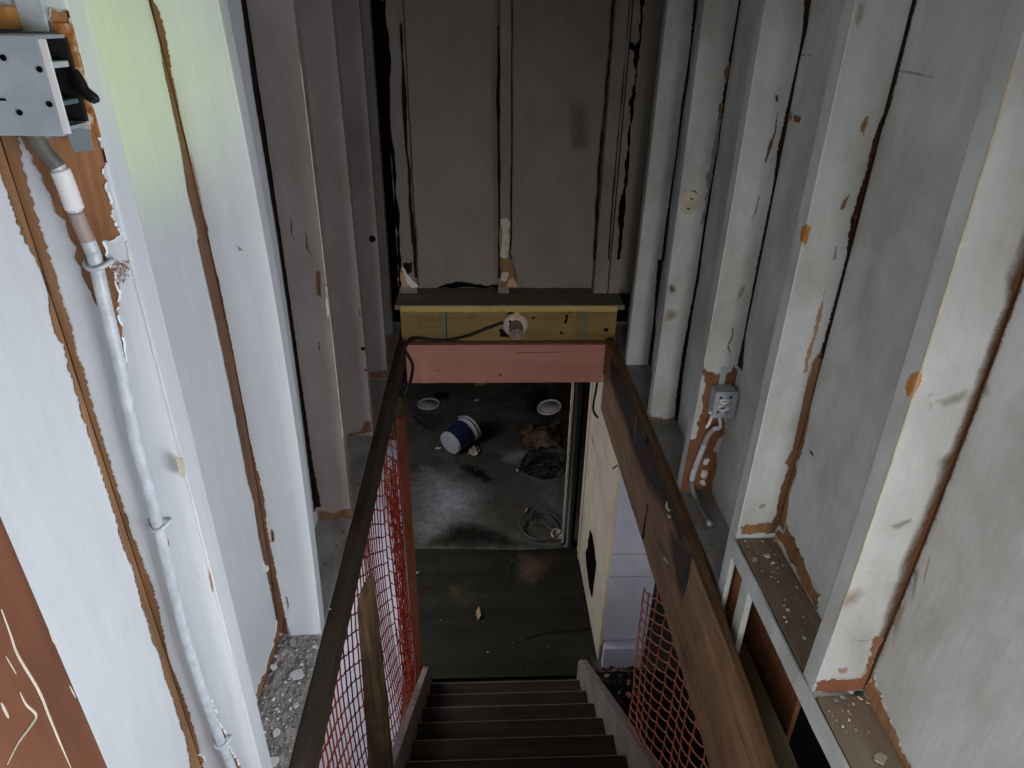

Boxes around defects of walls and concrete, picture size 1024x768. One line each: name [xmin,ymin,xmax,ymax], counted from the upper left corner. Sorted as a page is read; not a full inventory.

peeling [20,136,98,306]
peeling [45,136,130,379]
peeling [800,224,811,246]
crack [775,0,917,532]
peeling [680,364,738,492]
peeling [802,293,825,373]
peeling [905,371,922,398]
peeling [740,516,821,610]
peeling [813,634,912,768]